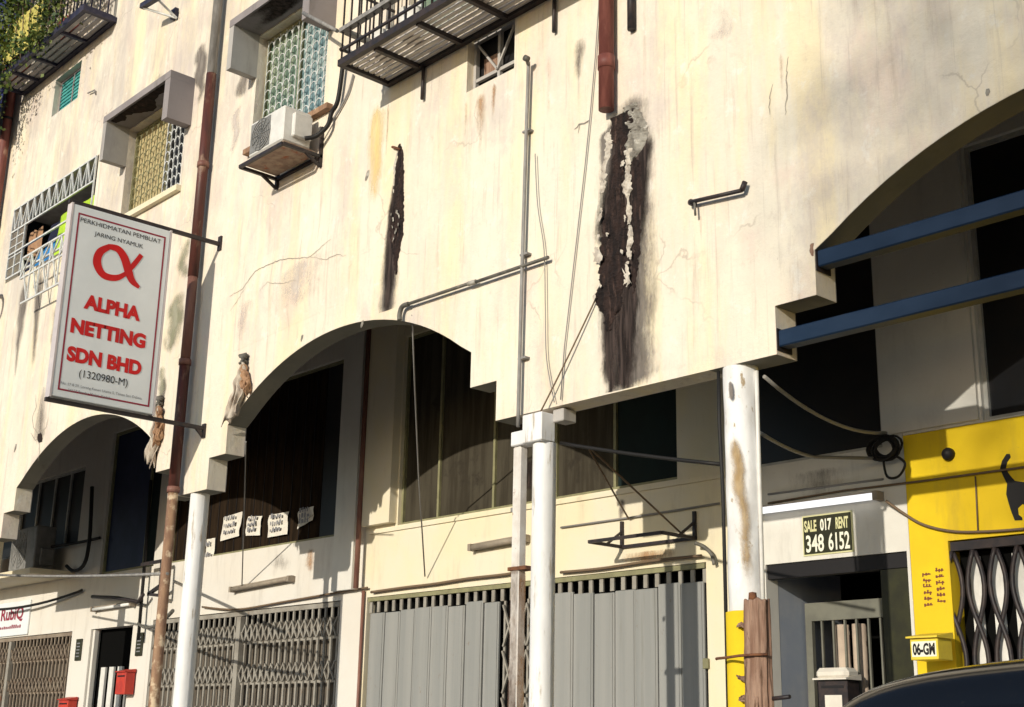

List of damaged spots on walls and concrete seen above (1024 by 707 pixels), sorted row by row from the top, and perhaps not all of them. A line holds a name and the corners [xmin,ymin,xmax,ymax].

leakage [371,111,388,185]